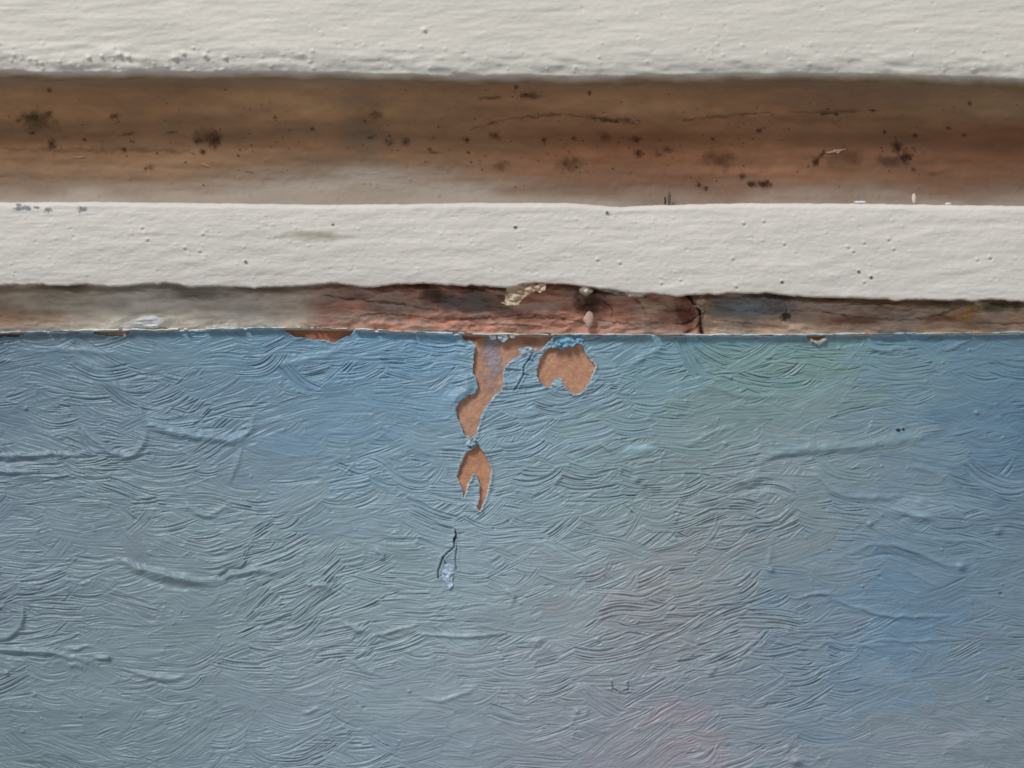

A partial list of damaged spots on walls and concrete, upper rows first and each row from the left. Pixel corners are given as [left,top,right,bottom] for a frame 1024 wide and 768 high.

damp [0,85,1024,194]
peeling [285,281,1024,511]
crack [438,530,457,589]